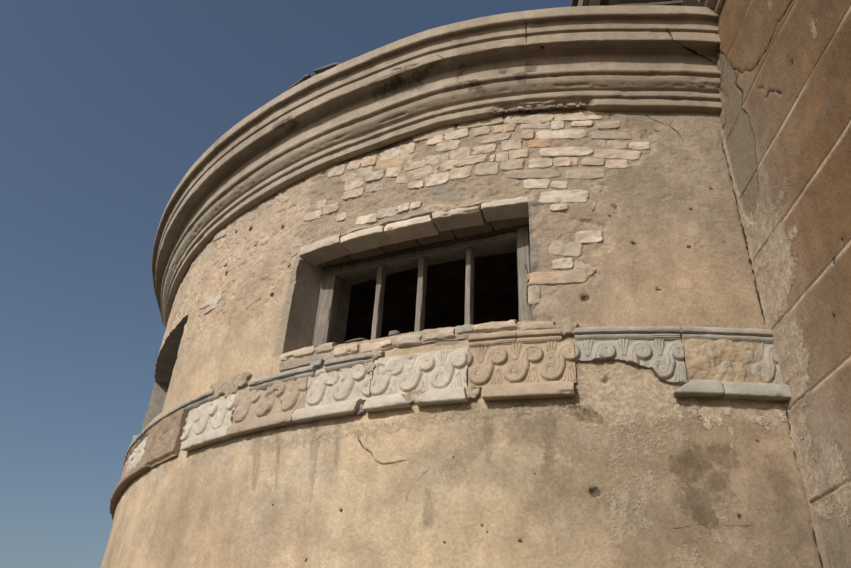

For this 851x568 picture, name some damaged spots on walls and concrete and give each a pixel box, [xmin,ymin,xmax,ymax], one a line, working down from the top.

flaking render [288,102,653,321]
water stain [688,400,733,465]
crack [666,0,792,322]
water stain [742,157,851,525]